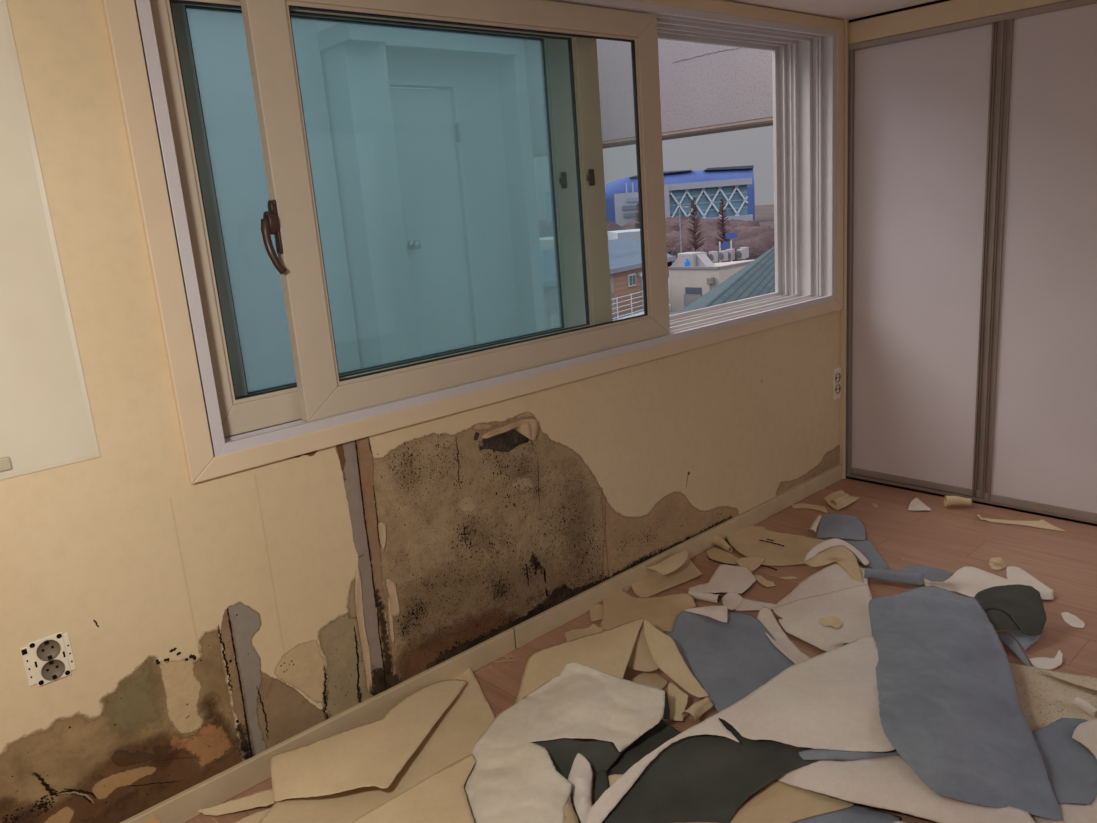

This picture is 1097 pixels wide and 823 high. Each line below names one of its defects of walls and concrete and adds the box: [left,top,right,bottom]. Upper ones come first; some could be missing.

spalling [474,419,539,452]
peeling [170,602,267,768]
peeling [335,437,393,697]
damp [0,415,738,823]